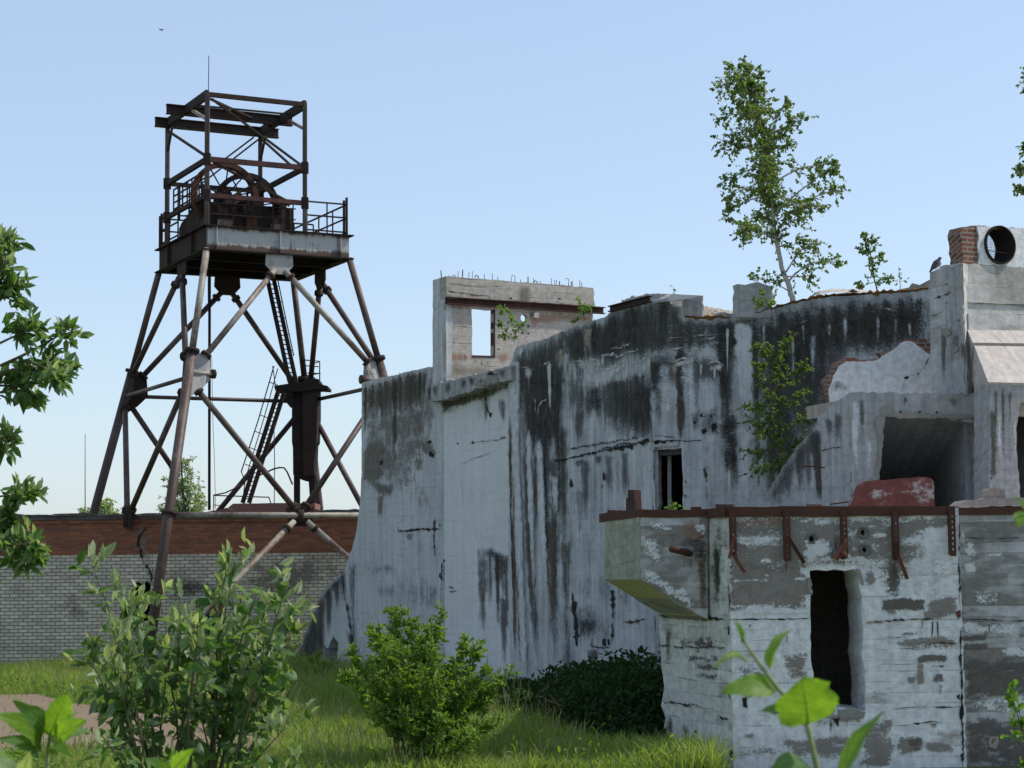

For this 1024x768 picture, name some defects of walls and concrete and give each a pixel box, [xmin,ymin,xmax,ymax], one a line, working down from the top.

water stain [363,373,473,514]
crack [555,436,701,466]
water stain [478,296,922,668]
crack [137,526,153,585]
crack [397,520,456,616]